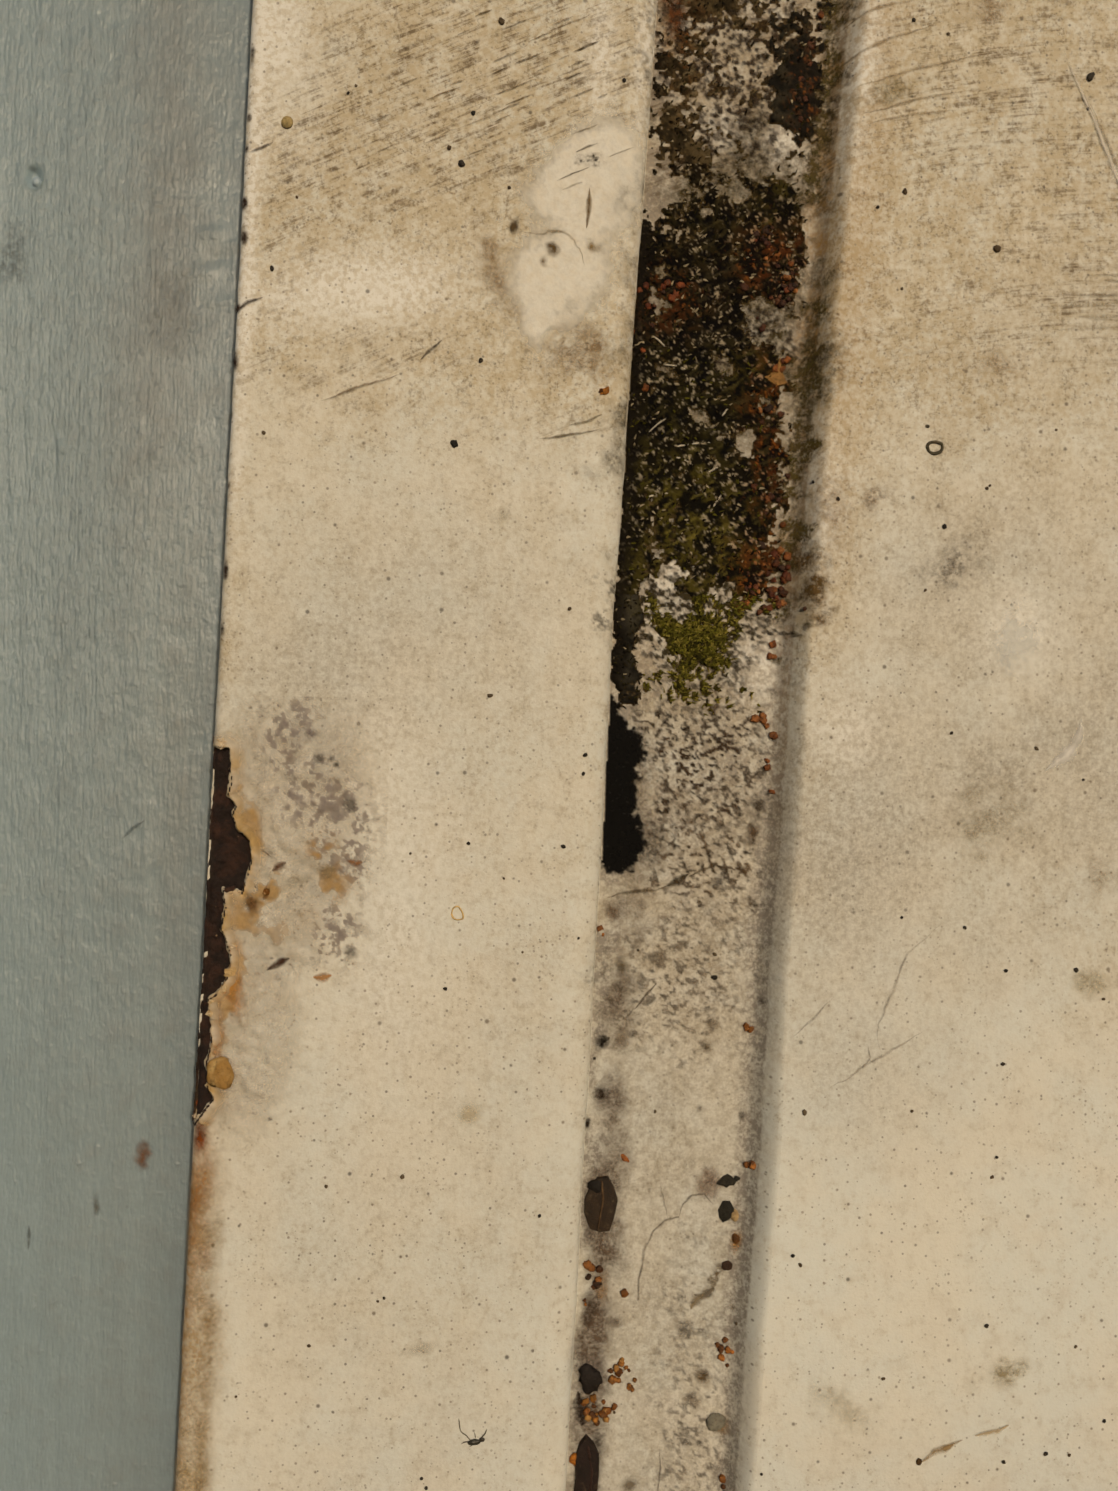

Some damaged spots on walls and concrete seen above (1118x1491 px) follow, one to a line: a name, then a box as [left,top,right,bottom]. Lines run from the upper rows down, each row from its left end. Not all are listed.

damp [601,0,836,874]